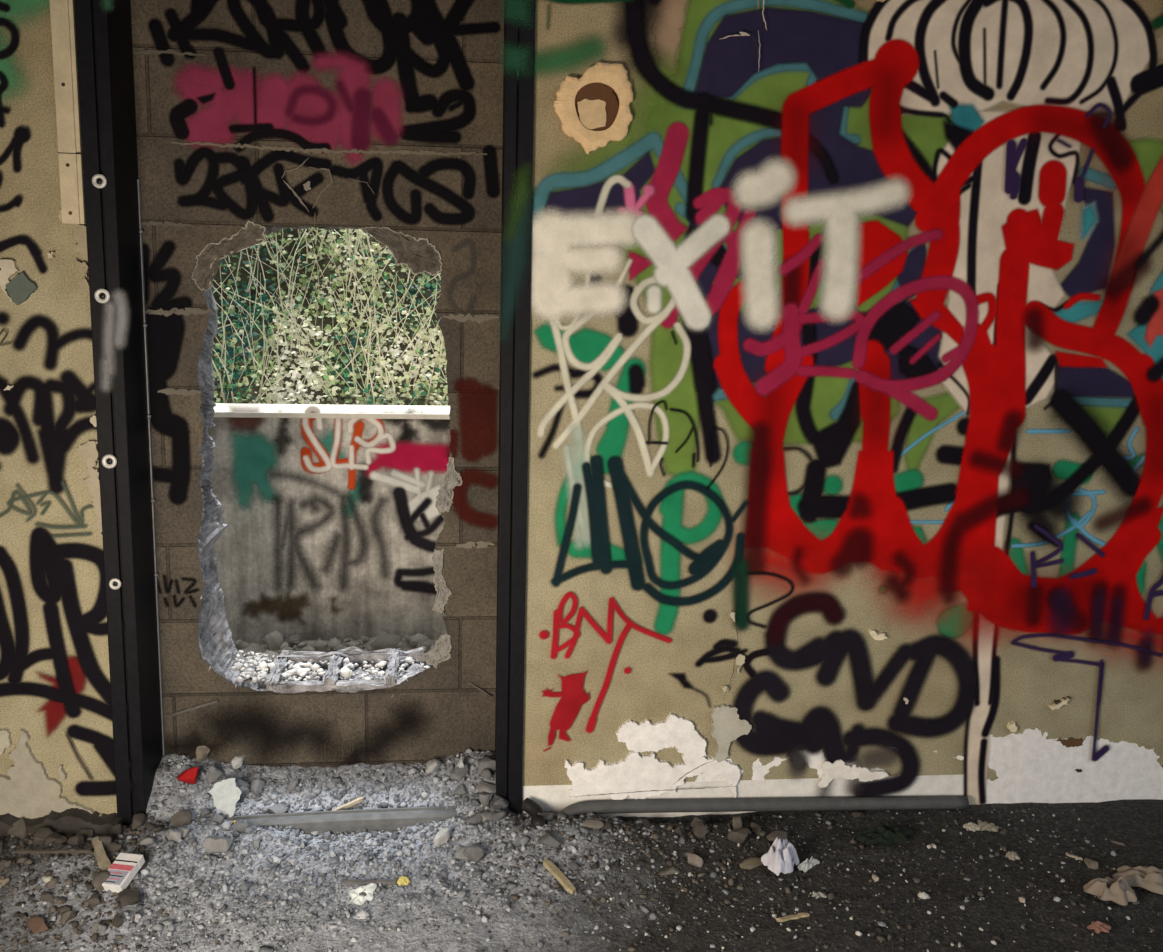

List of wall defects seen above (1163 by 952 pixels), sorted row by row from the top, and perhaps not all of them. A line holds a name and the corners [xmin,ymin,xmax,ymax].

flaking render [553,62,633,155]
spalling [192,221,452,698]
spalling [435,450,463,530]
peeling [0,728,103,819]
peeling [564,703,788,800]
peeling [801,751,898,788]
peeling [985,721,1163,804]
peeling [977,821,999,832]